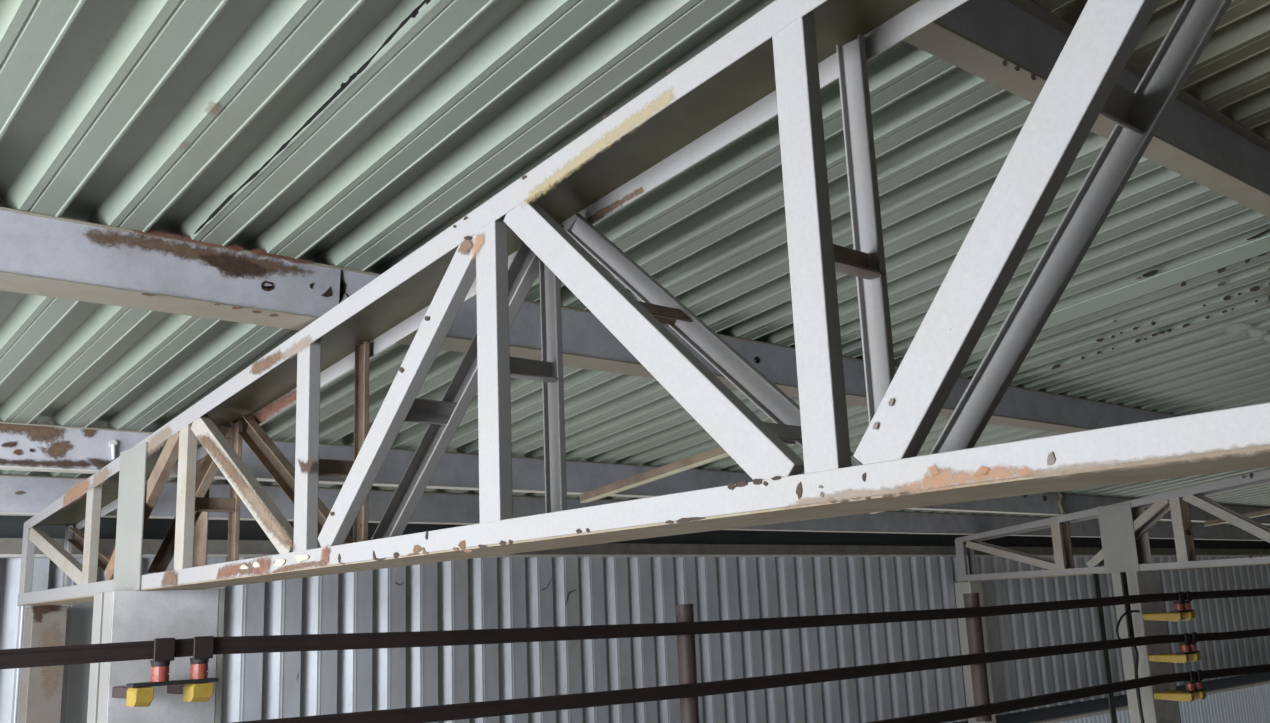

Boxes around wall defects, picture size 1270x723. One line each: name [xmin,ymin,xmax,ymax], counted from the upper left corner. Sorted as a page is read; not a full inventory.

corrosion [86,228,314,278]
corrosion [252,337,311,374]
corrosion [195,436,295,549]
peeling [727,476,781,490]
peeling [217,546,345,578]
peeling [373,530,429,561]
peeling [452,540,512,552]